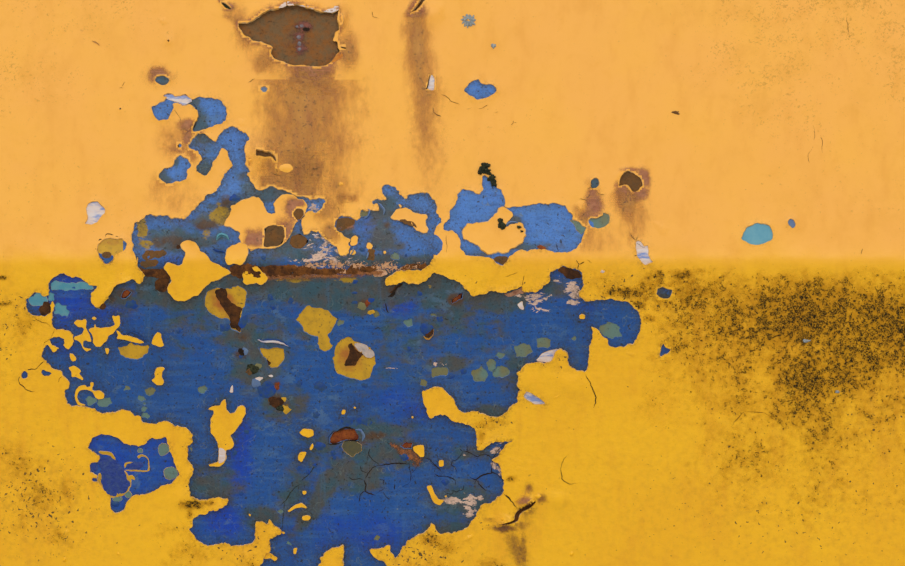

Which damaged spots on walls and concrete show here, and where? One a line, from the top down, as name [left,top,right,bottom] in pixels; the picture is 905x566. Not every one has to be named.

spalling [239,1,346,66]
rust [407,0,434,134]
rust [219,0,355,239]
rust [579,190,602,225]
rust [615,168,650,220]
peeling [742,223,773,245]
peeling [18,76,642,566]
mould [604,266,905,481]
crack [349,445,504,501]